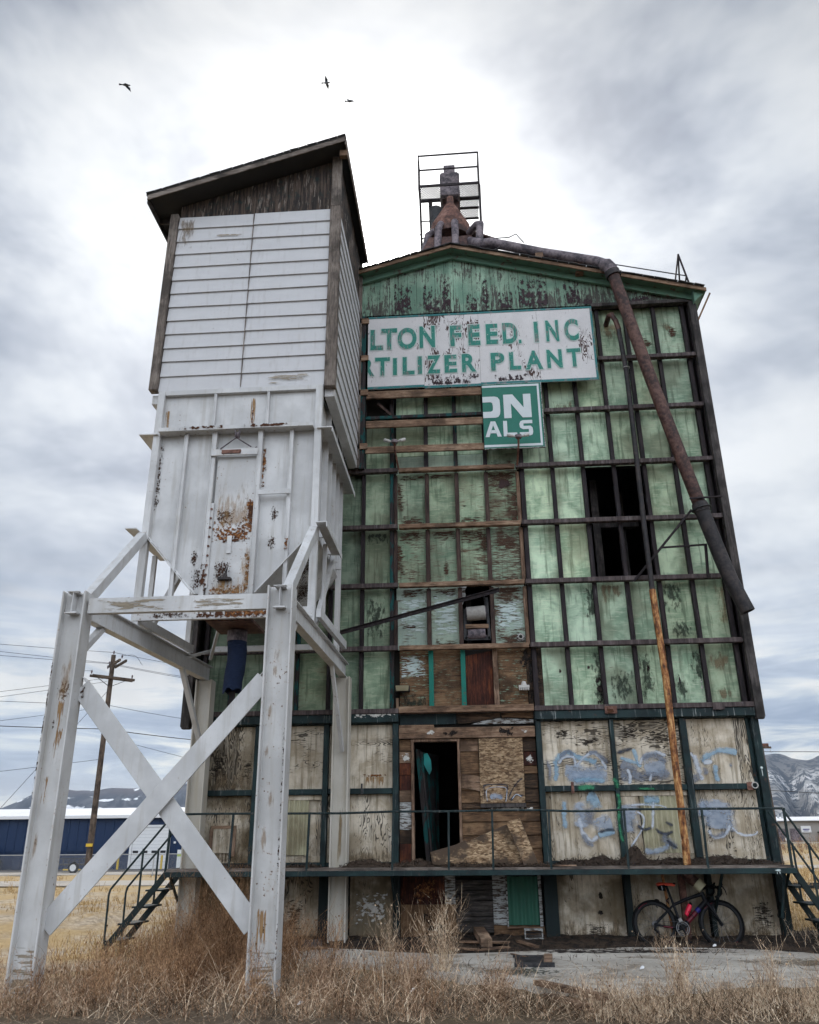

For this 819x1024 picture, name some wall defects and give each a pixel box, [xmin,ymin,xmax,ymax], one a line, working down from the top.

peeling [394,281,451,314]
peeling [466,278,548,310]
peeling [563,280,593,305]
rust [249,398,287,427]
rust [189,498,254,594]
rust [153,610,266,618]
peeling [401,656,425,677]
peeling [356,893,388,924]